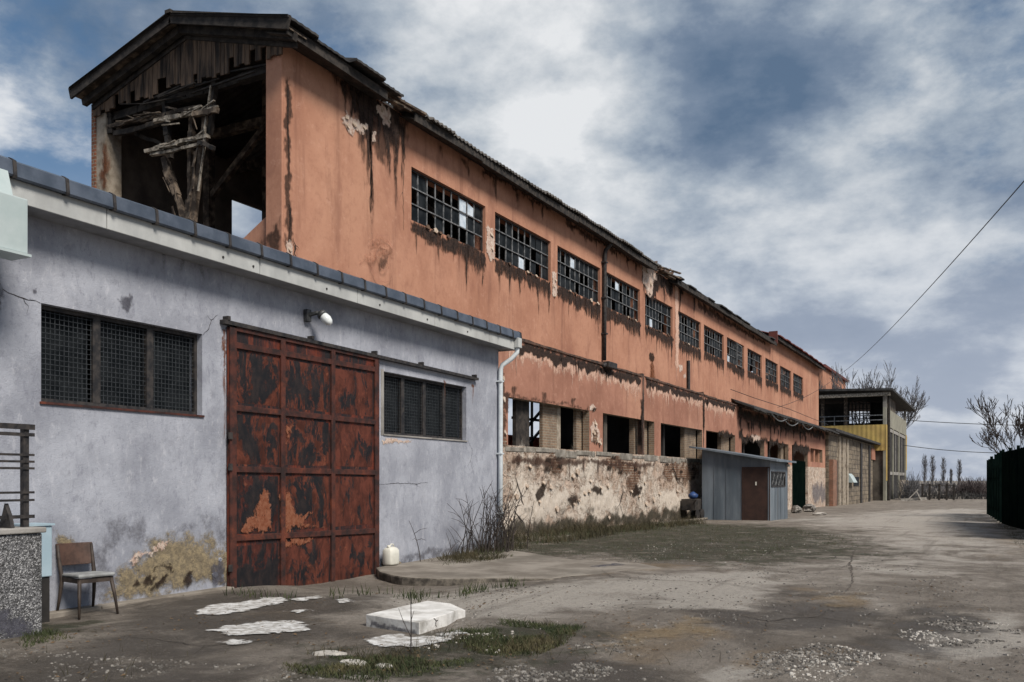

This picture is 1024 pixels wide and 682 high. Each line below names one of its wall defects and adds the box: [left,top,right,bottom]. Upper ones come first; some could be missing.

water stain [283,79,293,243]
water stain [332,73,408,209]
spalling [342,87,405,142]
peeling [486,226,495,261]
water stain [411,219,804,404]
spalling [641,261,674,298]
peeling [503,404,700,536]
corrosion [241,486,319,547]
peeling [105,530,227,600]